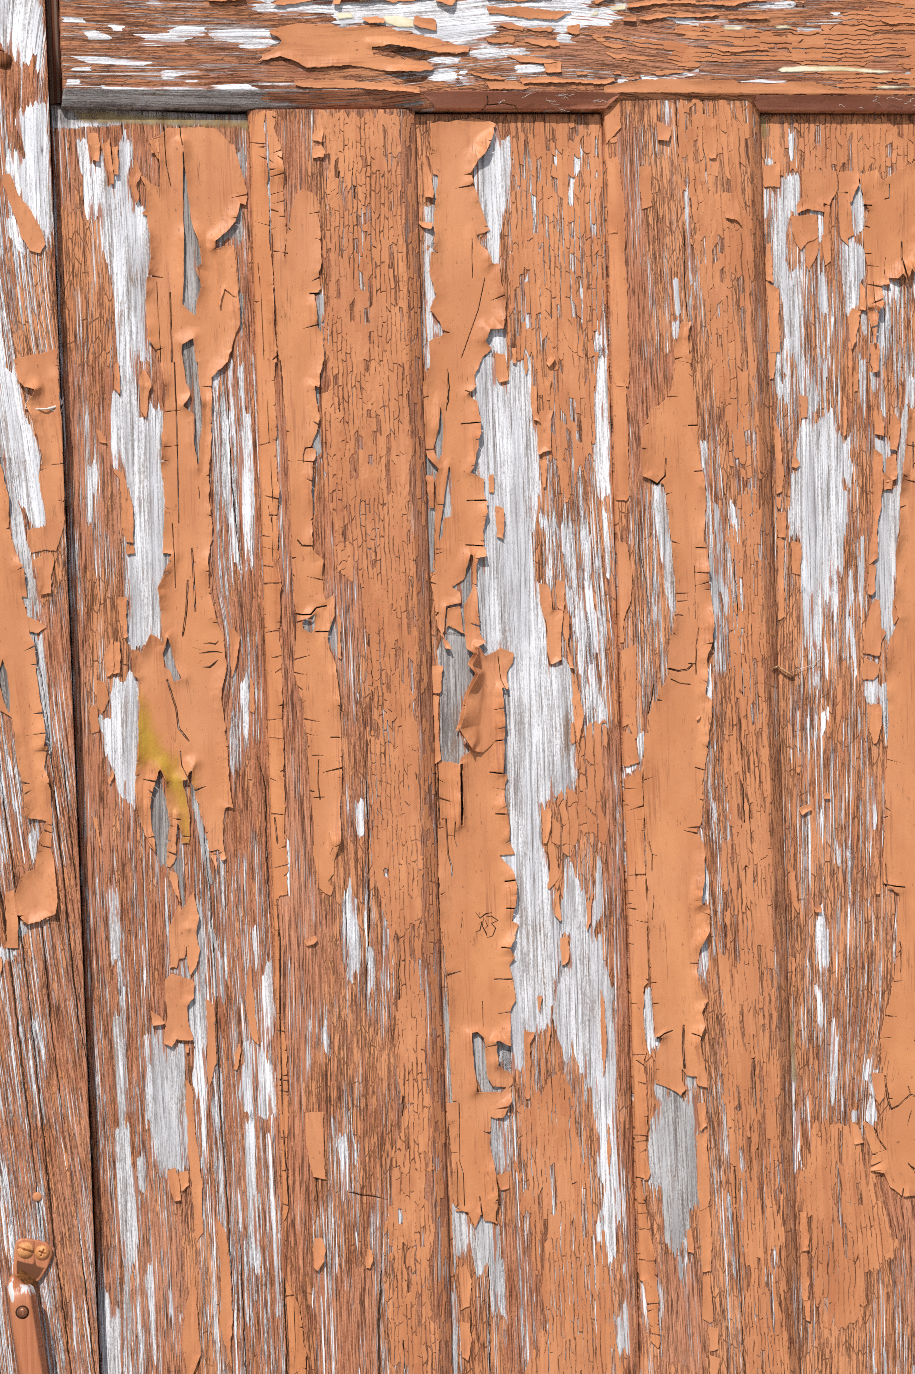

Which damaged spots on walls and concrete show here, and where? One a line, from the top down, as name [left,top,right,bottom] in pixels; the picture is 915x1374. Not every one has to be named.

peeling [0,0,43,73]
peeling [62,16,125,40]
peeling [66,56,259,90]
peeling [133,0,915,144]
peeling [0,101,390,1374]
peeling [586,157,743,1374]
crack [592,0,915,1374]
peeling [763,130,915,1197]
peeling [799,1212,811,1321]
peeling [873,1338,915,1374]